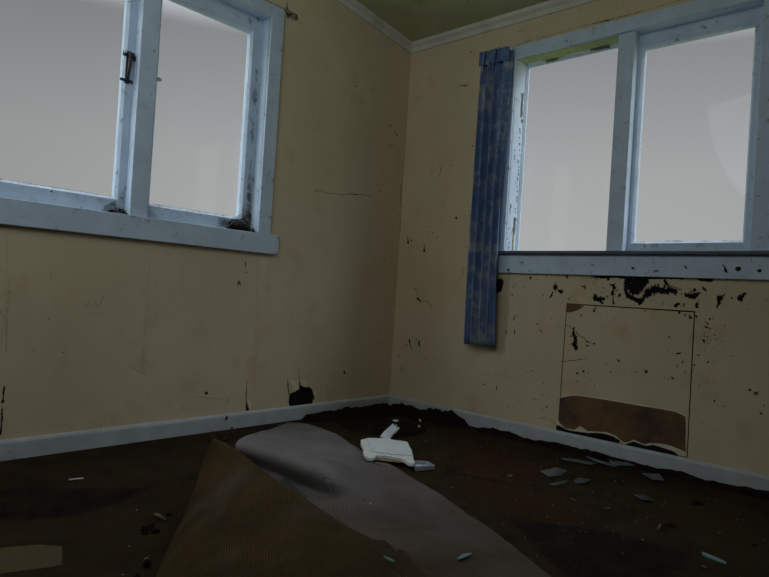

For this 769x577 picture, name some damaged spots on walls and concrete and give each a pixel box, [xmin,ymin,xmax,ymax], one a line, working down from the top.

peeling [566,304,583,312]
water stain [558,325,596,350]
water stain [581,265,733,378]
spalling [287,373,317,406]
peeling [557,395,686,456]